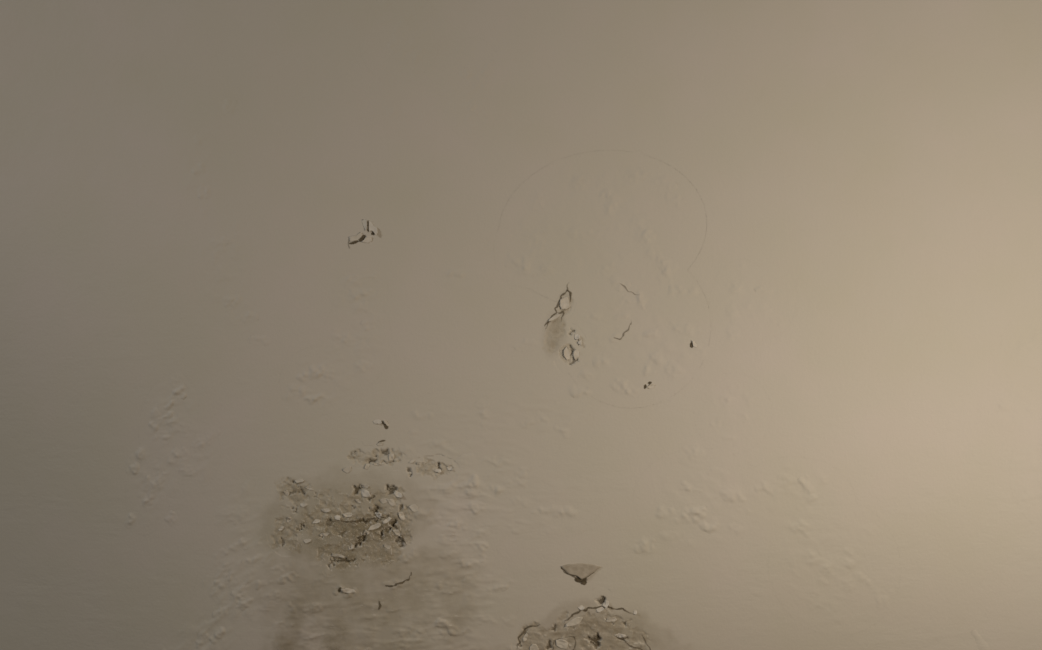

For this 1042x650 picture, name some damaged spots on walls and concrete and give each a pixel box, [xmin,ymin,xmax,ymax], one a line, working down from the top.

peeling [538,292,589,374]
flaking render [264,419,467,576]
flaking render [510,563,668,650]